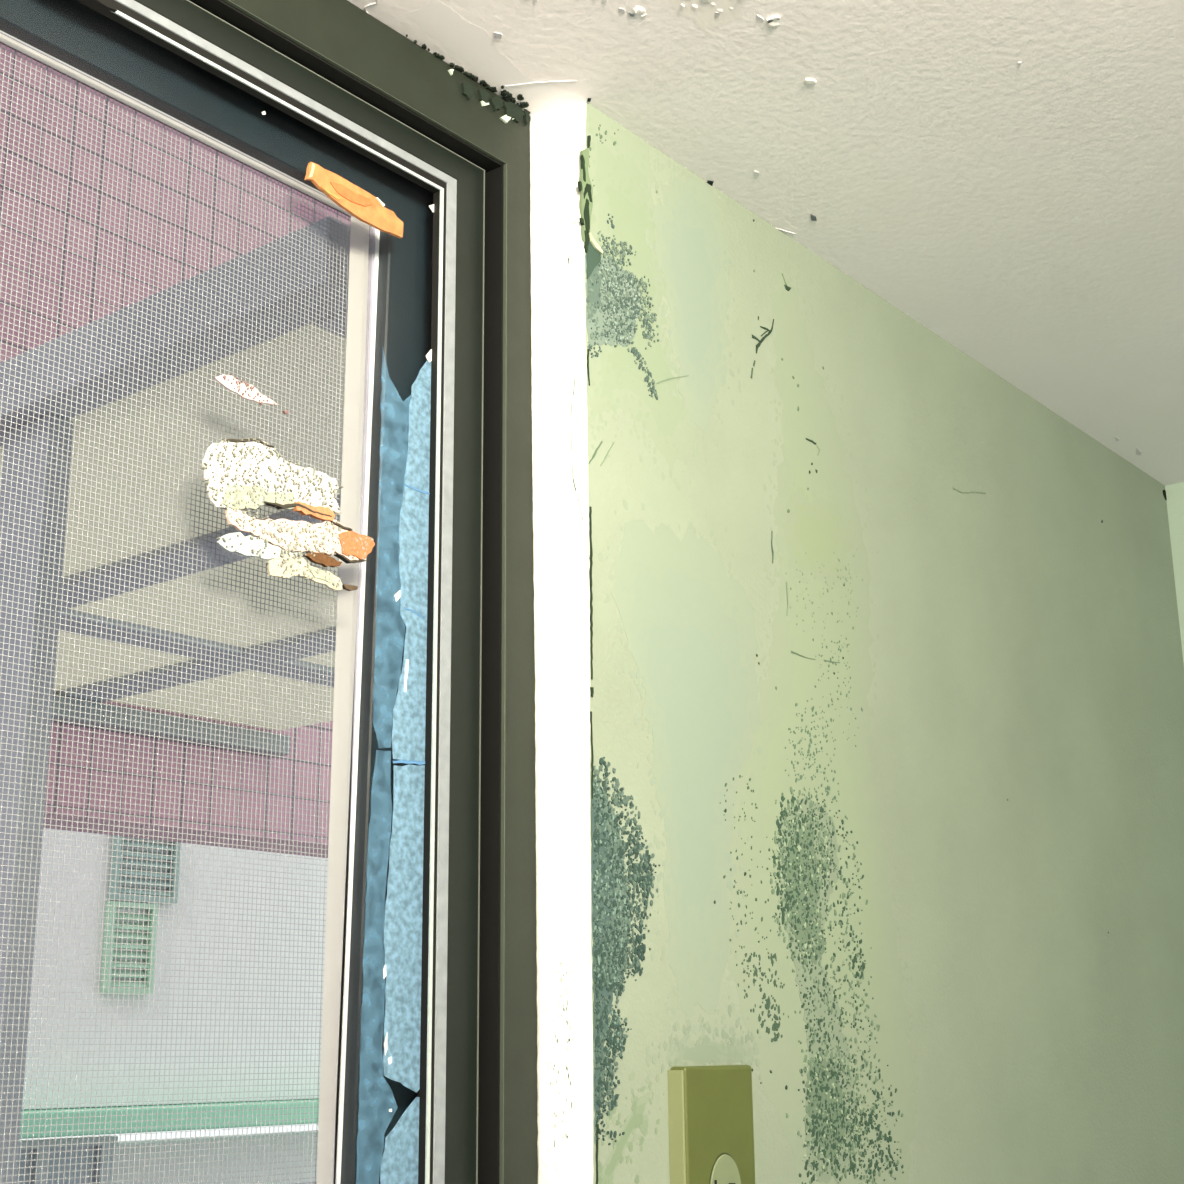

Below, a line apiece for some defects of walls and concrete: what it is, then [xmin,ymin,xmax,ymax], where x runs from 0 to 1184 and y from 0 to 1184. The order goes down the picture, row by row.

flaking render [406,34,529,109]
leakage [585,104,741,491]
leakage [591,250,919,1184]